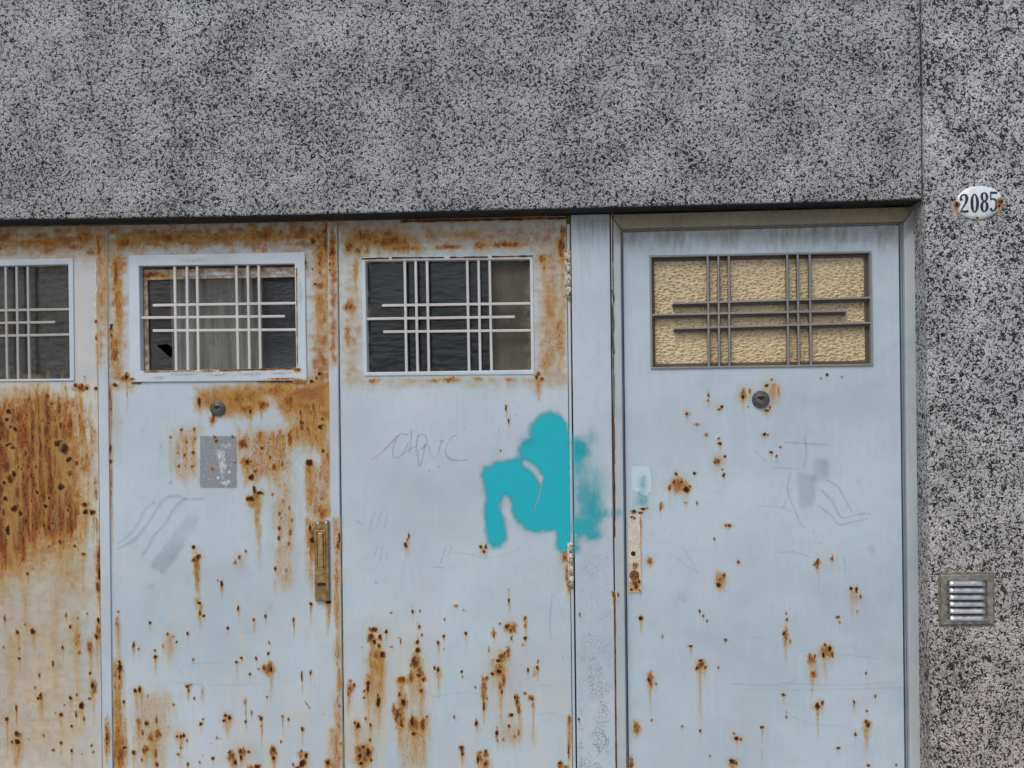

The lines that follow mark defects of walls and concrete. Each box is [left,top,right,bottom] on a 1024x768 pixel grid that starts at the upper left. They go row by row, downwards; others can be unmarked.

rust [0,217,569,768]
rust [668,471,698,505]
rust [612,516,652,768]
rust [808,643,834,685]